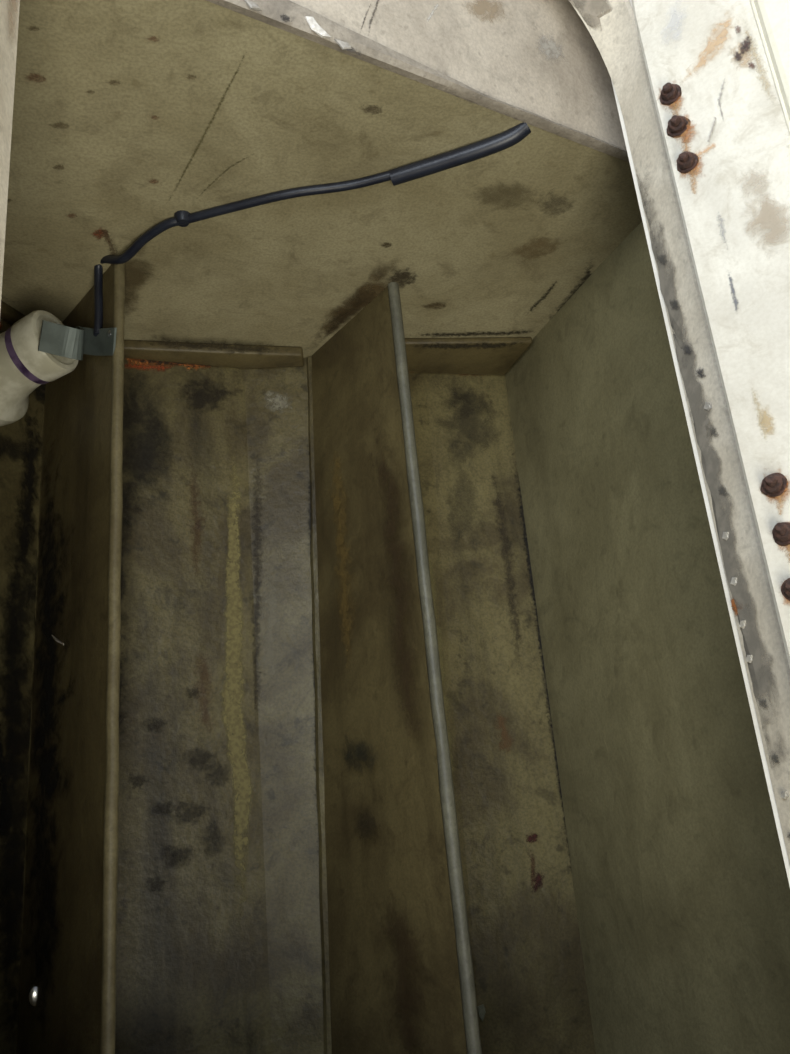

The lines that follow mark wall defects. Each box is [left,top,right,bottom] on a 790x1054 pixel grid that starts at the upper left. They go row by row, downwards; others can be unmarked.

damp [568,0,611,27]
corrosion [669,97,715,194]
damp [150,338,272,353]
damp [122,387,168,525]
damp [0,418,67,1024]
damp [220,466,251,883]
damp [517,475,570,855]